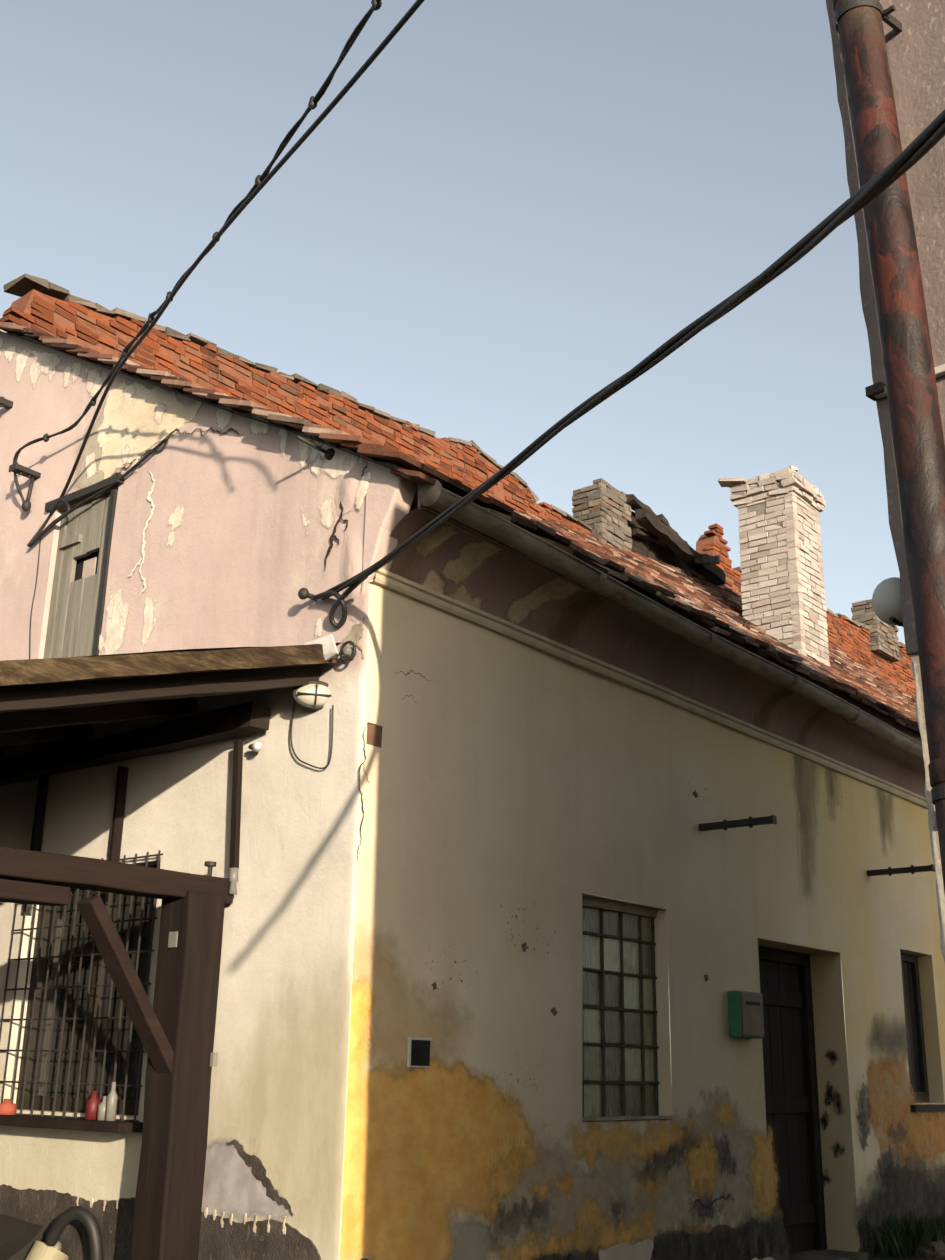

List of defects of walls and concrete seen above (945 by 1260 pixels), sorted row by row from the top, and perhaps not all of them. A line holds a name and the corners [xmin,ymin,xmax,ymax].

peeling [0,338,204,489]
peeling [249,413,370,509]
peeling [166,504,184,547]
crack [112,427,242,598]
peeling [301,498,335,535]
crack [324,502,348,571]
flaking render [912,661,945,962]
peeling [340,981,778,1260]
flaking render [820,1085,842,1131]
peeling [856,1056,945,1179]
water stain [857,1158,945,1242]